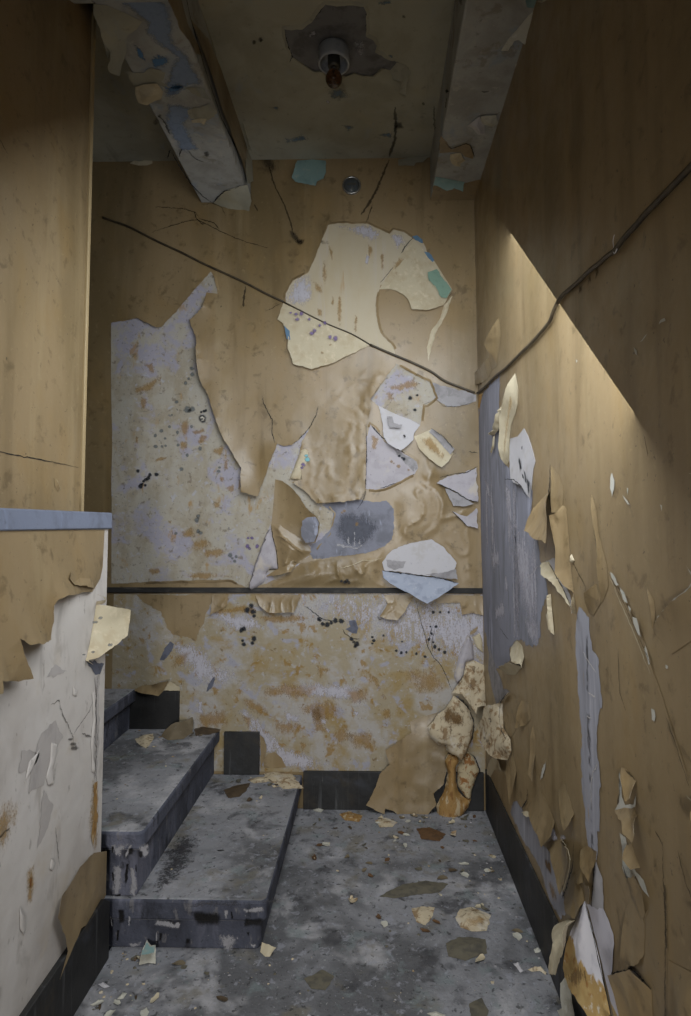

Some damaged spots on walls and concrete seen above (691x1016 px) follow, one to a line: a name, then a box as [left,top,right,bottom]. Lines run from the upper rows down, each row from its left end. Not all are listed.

peeling [93,4,142,76]
spalling [282,1,411,96]
peeling [168,0,253,211]
damp [175,642,234,684]
damp [220,604,260,646]
peeling [0,215,653,1016]
damp [295,593,484,663]
damp [242,712,325,770]